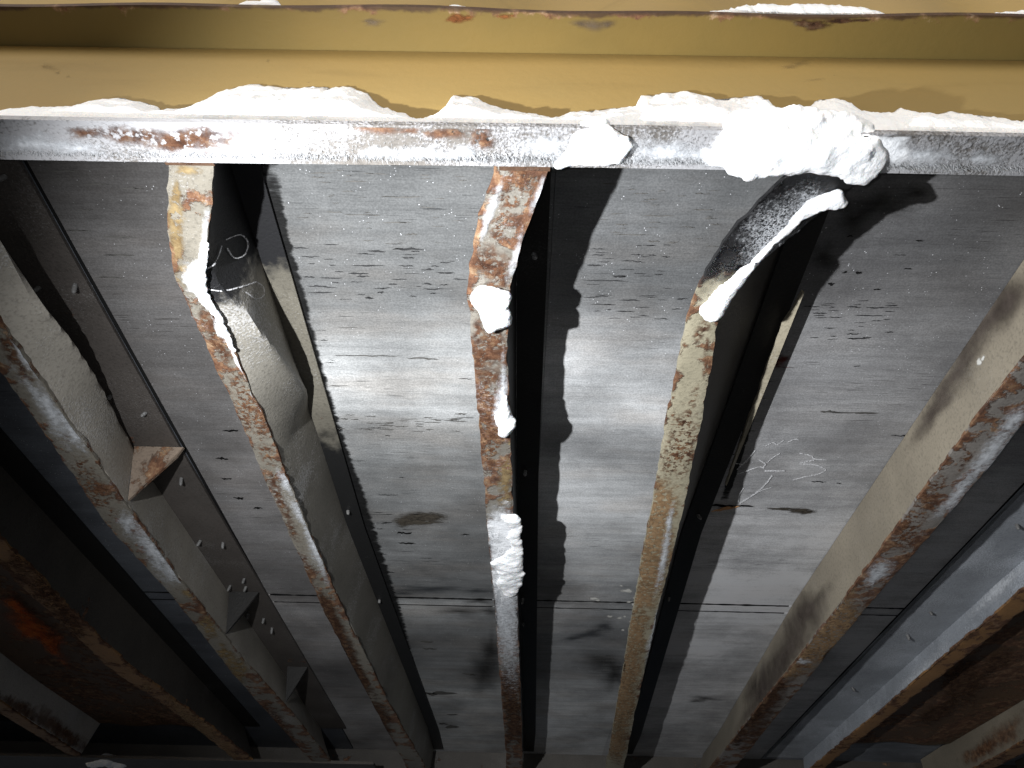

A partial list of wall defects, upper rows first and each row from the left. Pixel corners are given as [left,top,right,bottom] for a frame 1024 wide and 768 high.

corrosion [73,129,96,137]
corrosion [109,130,212,150]
corrosion [477,221,510,287]
water stain [712,184,785,271]
corrosion [200,311,229,364]
corrosion [233,375,296,536]
water stain [261,164,410,649]
corrosion [472,322,511,505]
corrosion [664,389,698,475]
water stain [722,406,755,499]
corrosion [321,596,391,735]
corrosion [609,480,677,762]